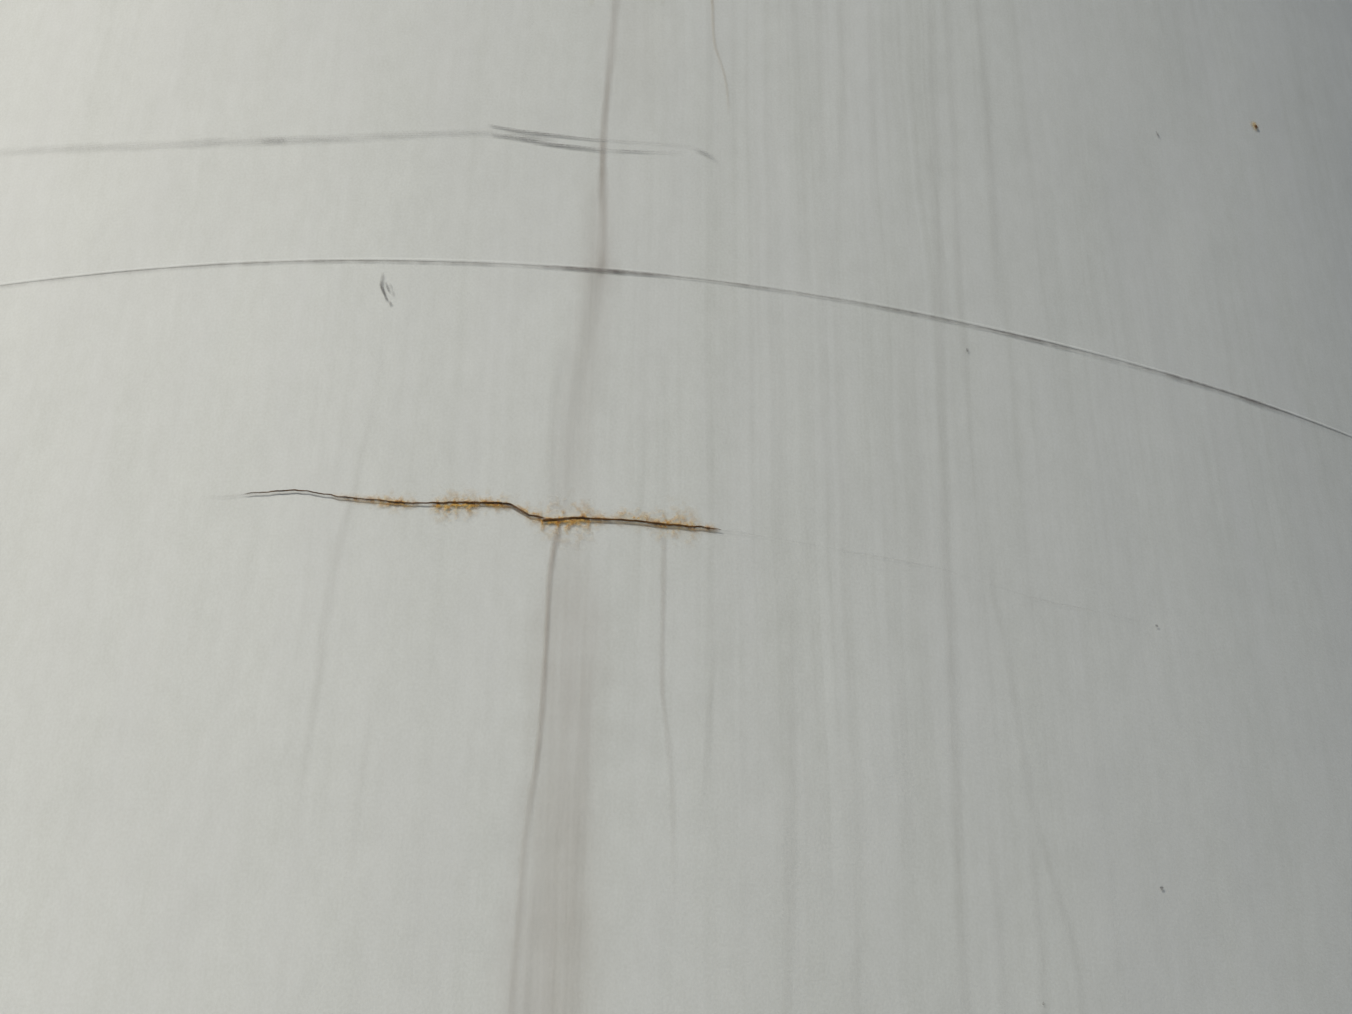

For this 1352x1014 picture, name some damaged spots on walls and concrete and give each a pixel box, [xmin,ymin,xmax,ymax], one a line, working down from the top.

crack [246,489,720,530]